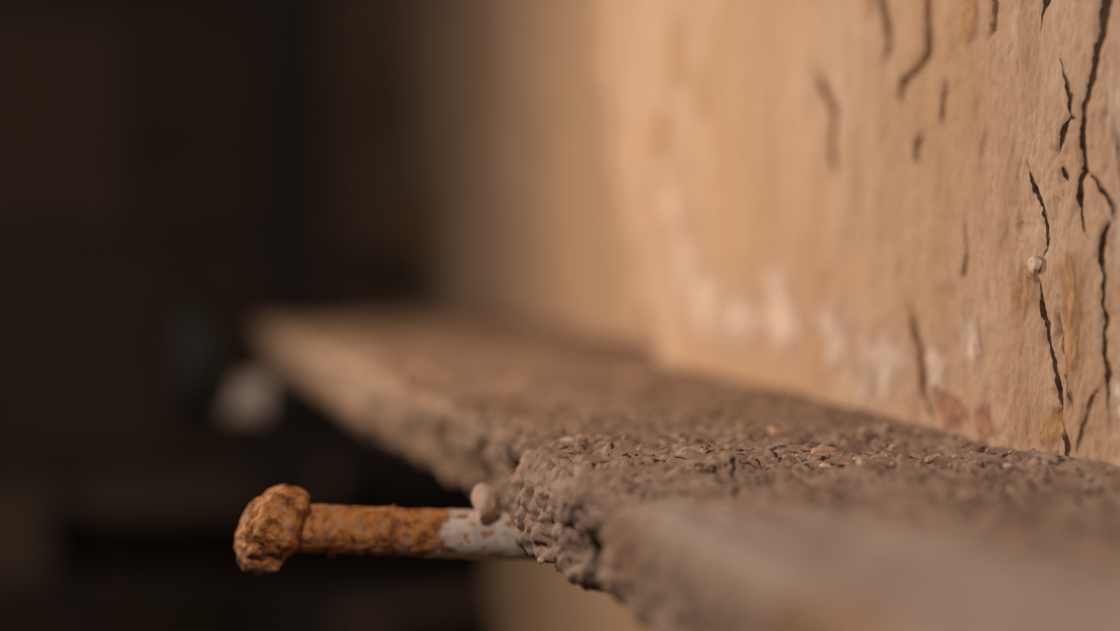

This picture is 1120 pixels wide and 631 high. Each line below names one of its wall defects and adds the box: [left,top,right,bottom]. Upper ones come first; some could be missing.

crack [878,0,948,163]
crack [961,222,969,278]
crack [1028,0,1120,456]